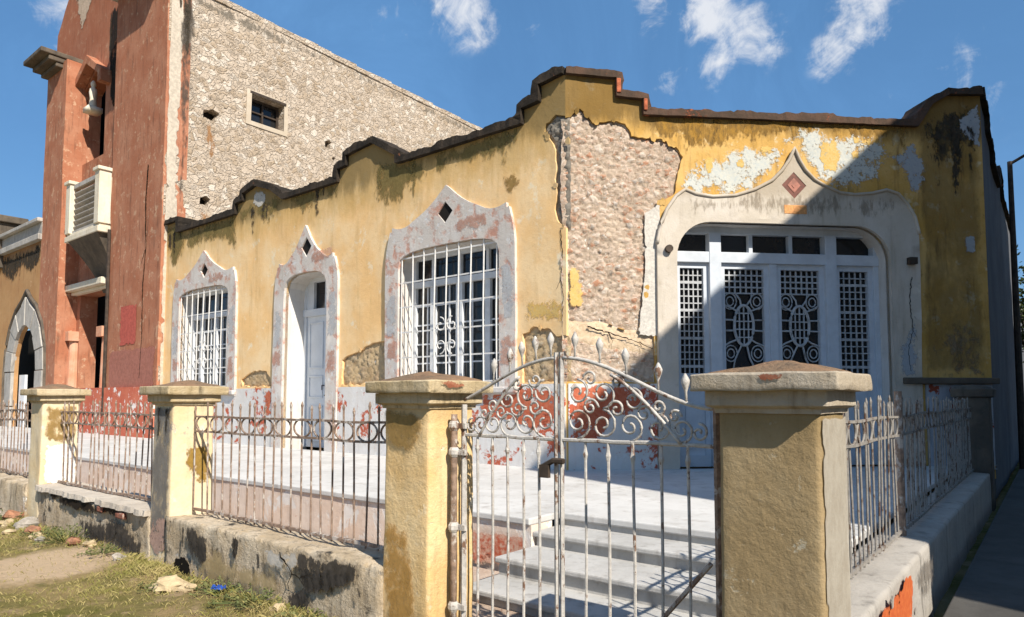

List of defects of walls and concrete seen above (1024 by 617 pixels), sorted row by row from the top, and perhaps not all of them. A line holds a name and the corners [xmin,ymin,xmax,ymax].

leakage [925,109,975,193]
peeling [456,213,486,232]
flaking render [480,108,925,439]
flaking render [227,306,281,418]
flaking render [327,291,396,387]
crack [908,279,918,370]
leakage [182,527,276,593]
leakage [288,554,361,613]
peeling [882,576,917,617]